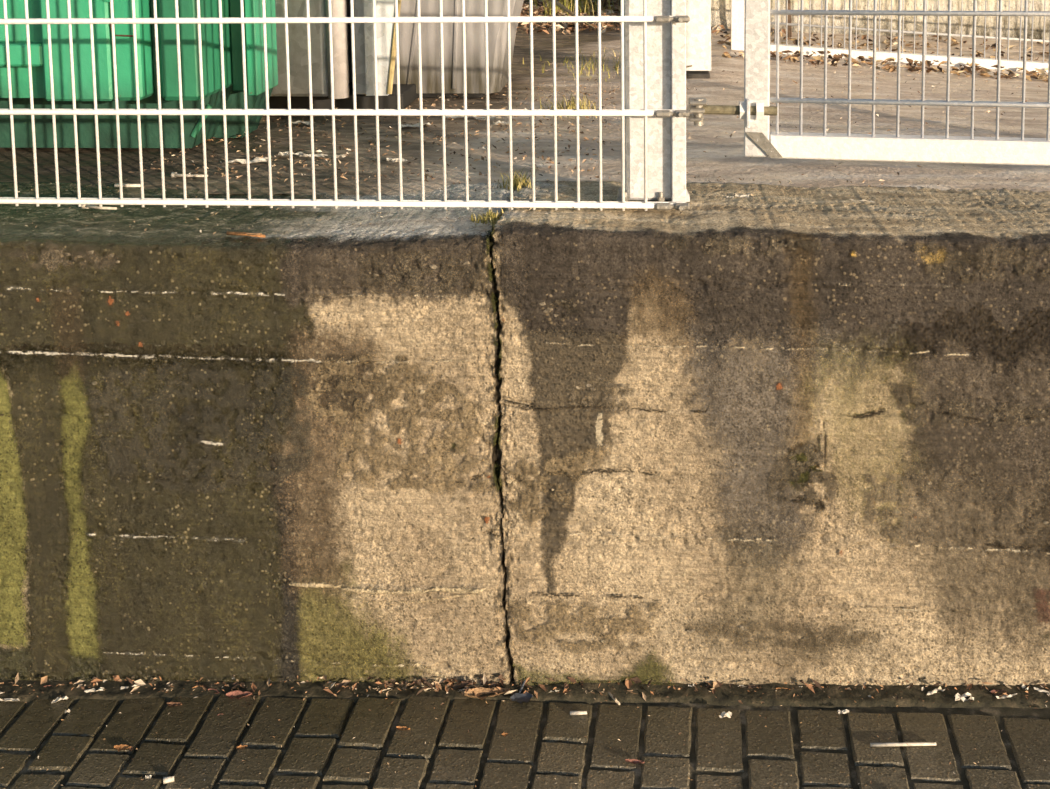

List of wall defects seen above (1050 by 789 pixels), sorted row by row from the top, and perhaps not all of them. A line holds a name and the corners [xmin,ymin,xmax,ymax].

damp [0,233,409,682]
crack [456,220,665,684]
damp [492,221,1050,639]